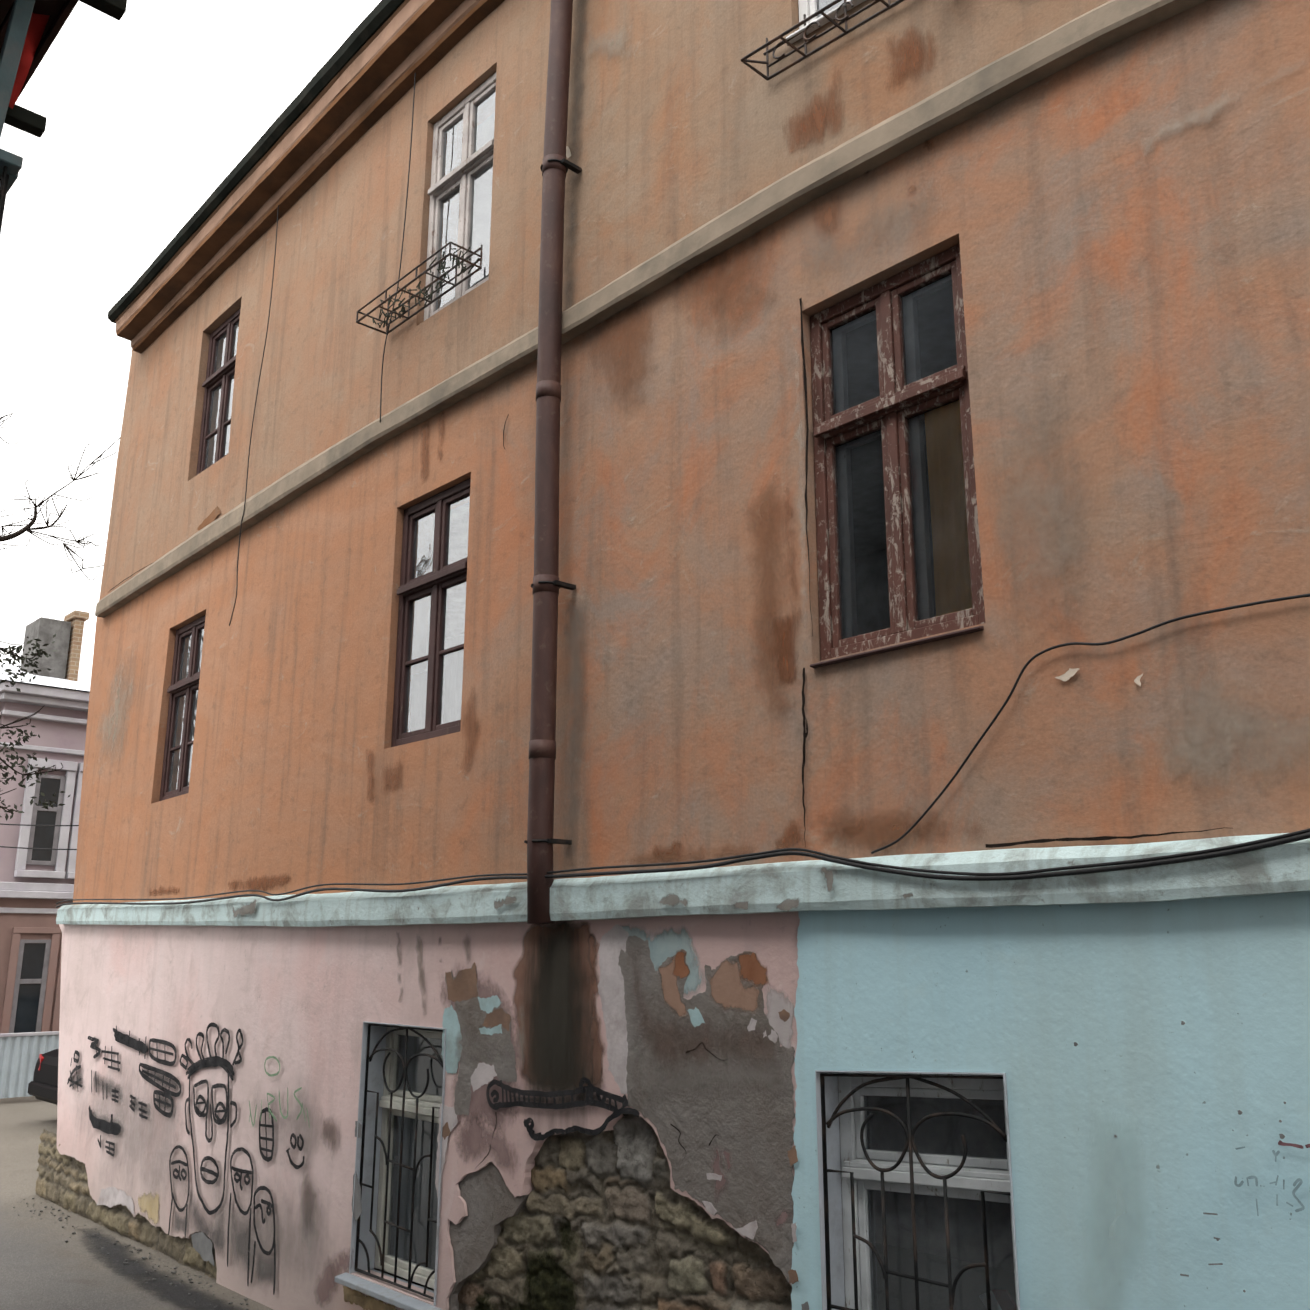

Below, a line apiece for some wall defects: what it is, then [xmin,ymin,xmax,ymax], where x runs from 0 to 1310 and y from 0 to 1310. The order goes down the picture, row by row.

spalling [435,924,809,1310]
peeling [352,1173,362,1221]
spalling [343,1286,404,1310]